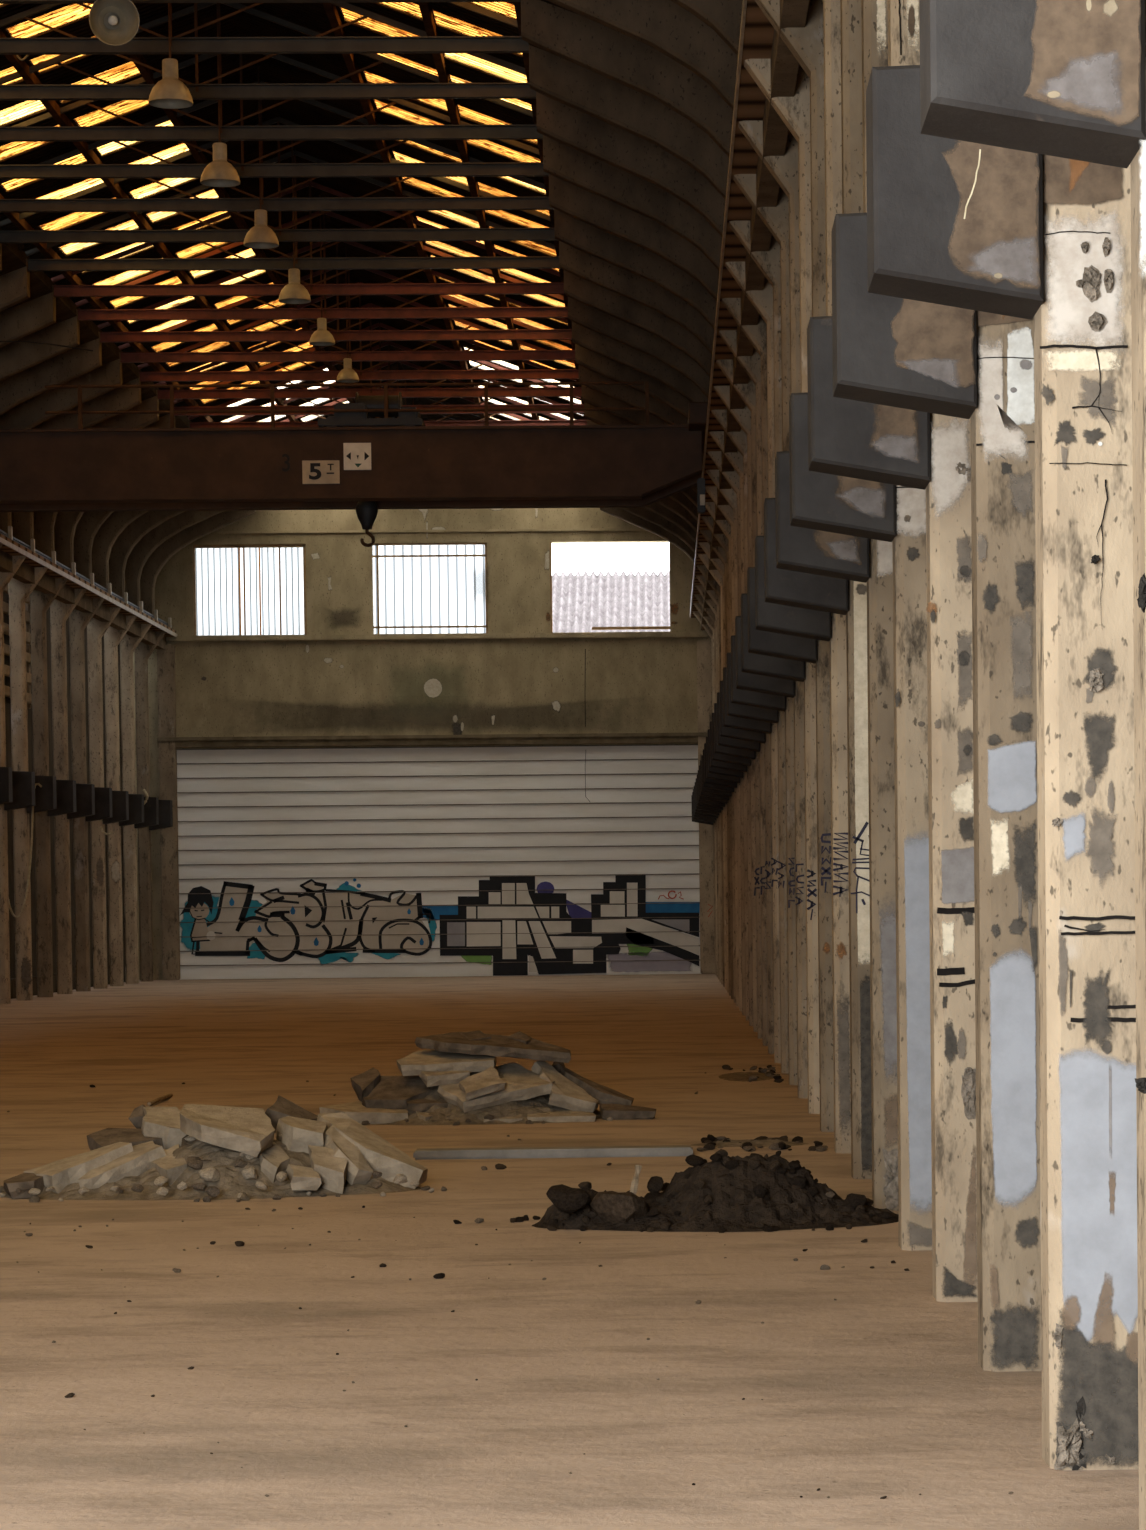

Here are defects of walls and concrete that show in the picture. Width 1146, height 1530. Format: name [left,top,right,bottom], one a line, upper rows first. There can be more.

peeling [1024,0,1141,126]
peeling [943,140,1123,289]
peeling [891,298,1030,387]
peeling [871,404,918,460]
damp [1063,648,1117,882]
damp [942,1149,1039,1368]
damp [1056,1275,1139,1466]